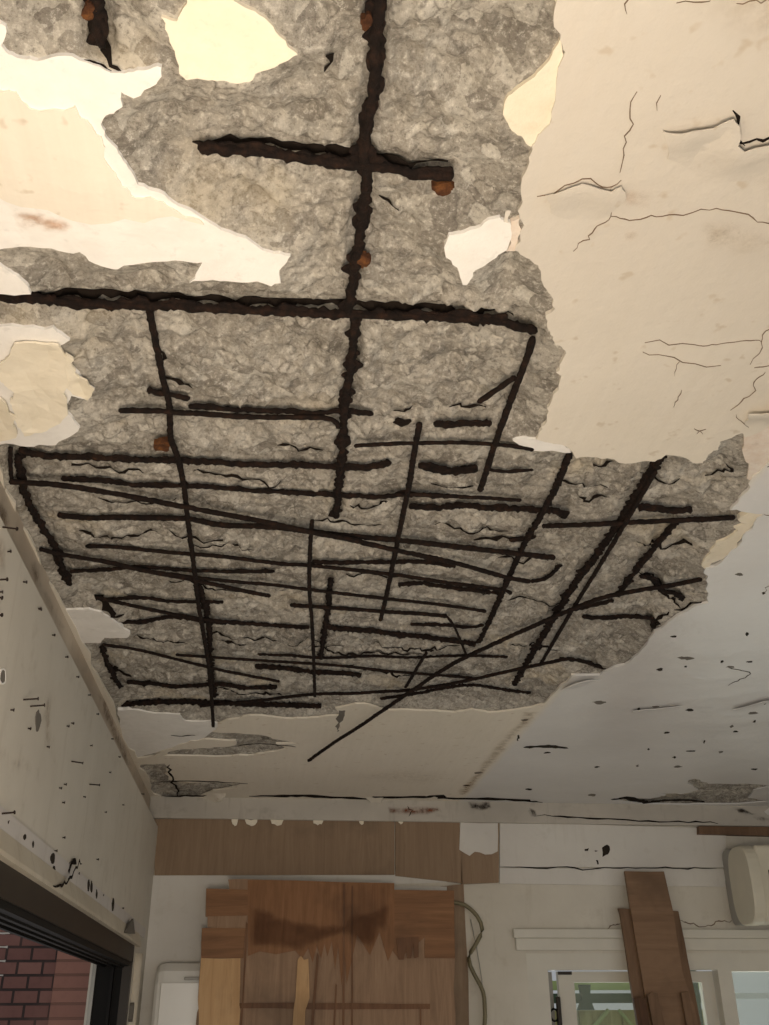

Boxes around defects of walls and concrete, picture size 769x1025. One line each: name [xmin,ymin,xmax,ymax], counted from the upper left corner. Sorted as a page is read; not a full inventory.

crack [537,92,769,252]
spalling [0,0,769,796]
crack [643,329,769,428]
crack [164,765,718,824]
spalling [619,779,769,815]
crack [53,858,82,888]
crack [520,864,716,872]